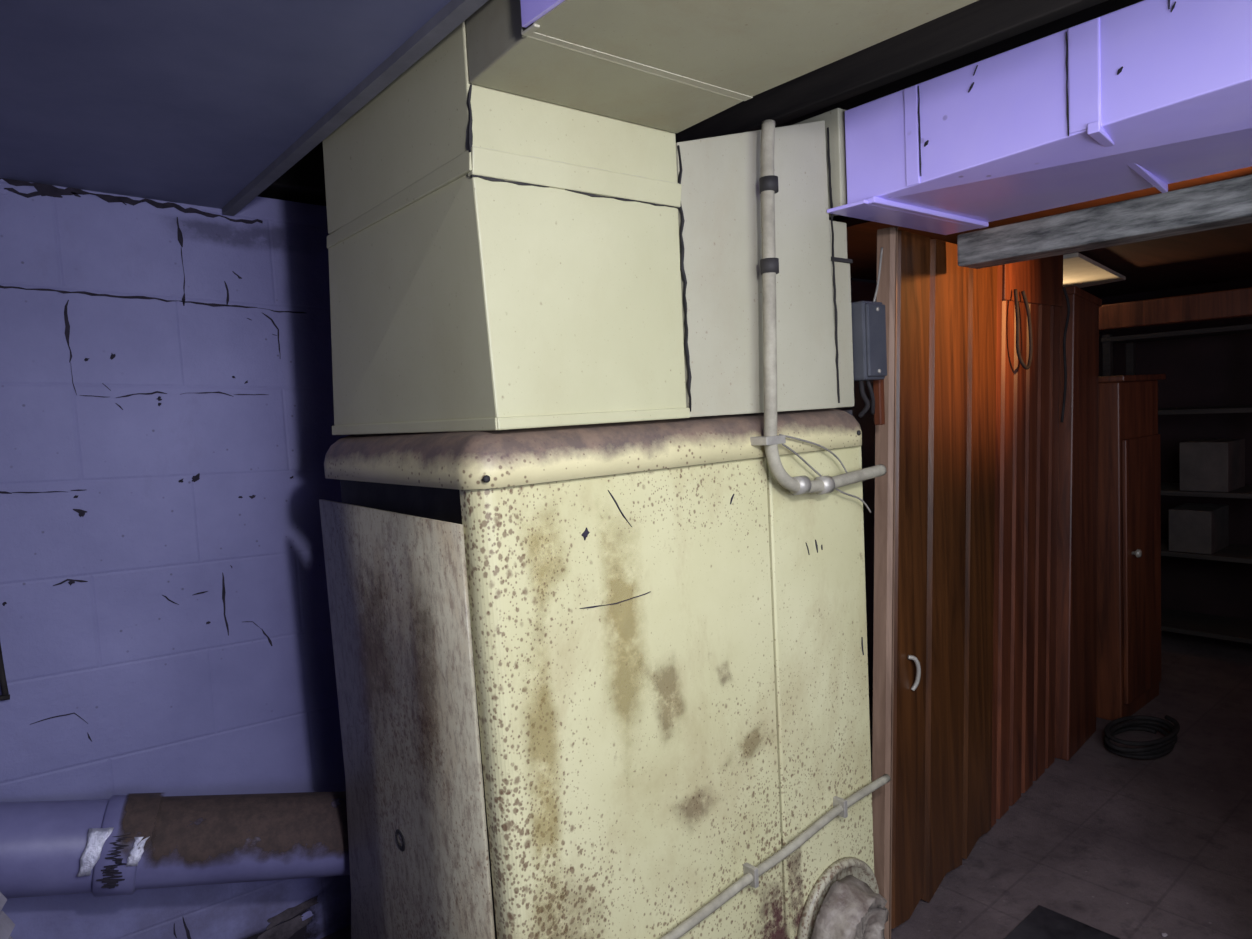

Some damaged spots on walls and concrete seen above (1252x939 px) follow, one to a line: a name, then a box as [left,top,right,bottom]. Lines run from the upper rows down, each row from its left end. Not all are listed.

crack [0,178,306,410]
spalling [257,895,318,939]